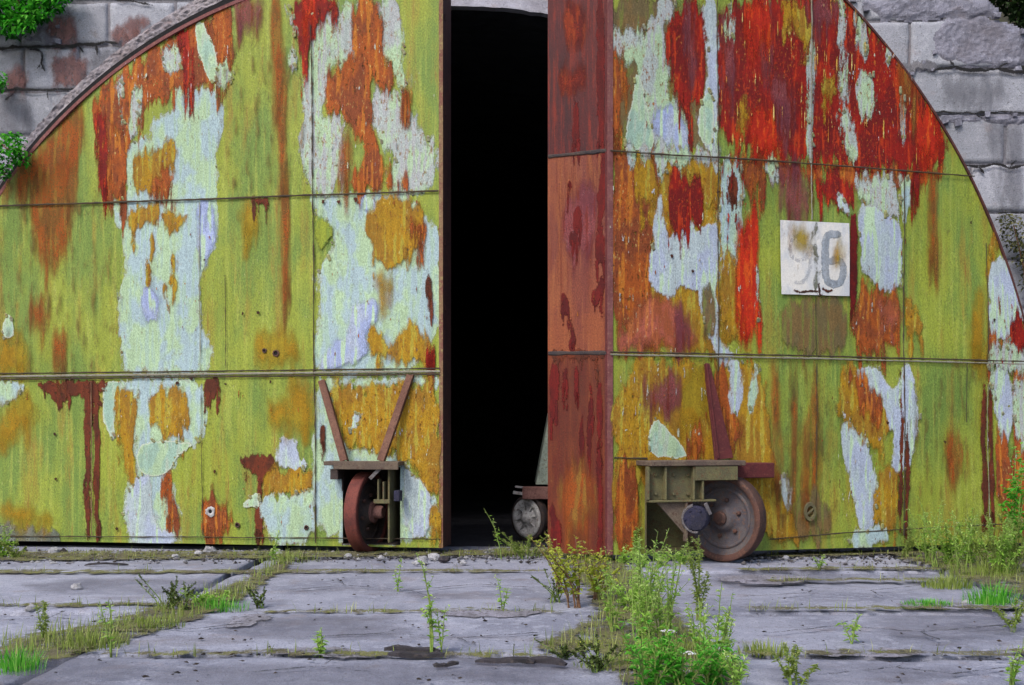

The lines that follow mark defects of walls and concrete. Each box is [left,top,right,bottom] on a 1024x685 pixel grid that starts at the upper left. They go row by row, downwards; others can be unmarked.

rust [0,7,234,544]
peeling [101,22,235,543]
rust [240,453,312,545]
peeling [243,0,439,546]
rust [325,0,441,547]
peeling [646,408,700,460]
peeling [613,0,761,416]
rust [549,0,948,555]
peeling [838,363,922,548]
rust [972,231,1024,541]
peeling [987,256,1024,464]